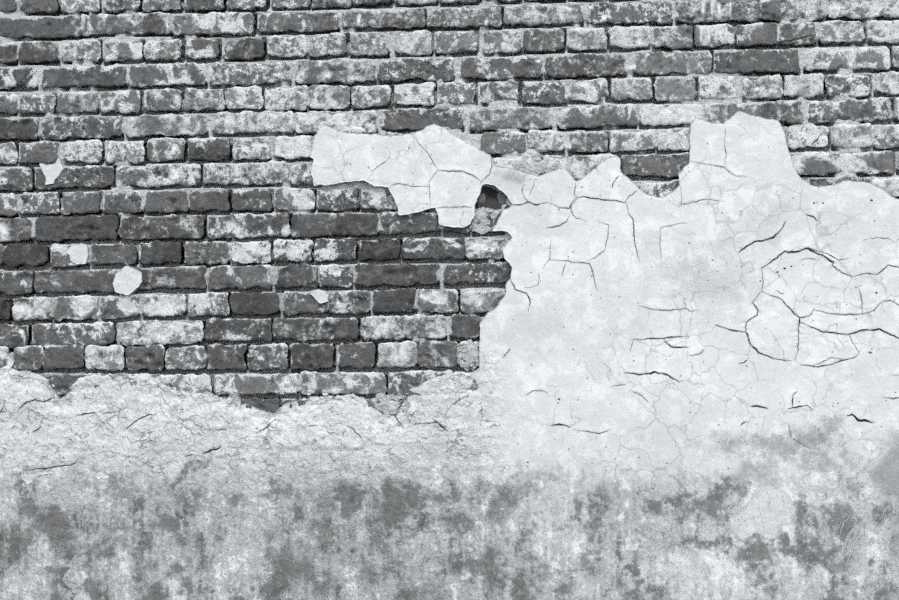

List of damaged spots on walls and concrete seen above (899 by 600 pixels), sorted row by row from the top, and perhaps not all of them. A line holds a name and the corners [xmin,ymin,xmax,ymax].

spalling [472,186,510,234]
crack [510,176,640,312]
crack [717,221,899,367]
peeling [0,368,55,401]
spalling [70,374,236,403]
spalling [301,339,480,417]
crack [613,371,680,401]
crack [848,414,874,423]
damp [0,477,77,600]
damp [365,470,425,555]
damp [643,465,764,520]
damp [686,499,888,592]